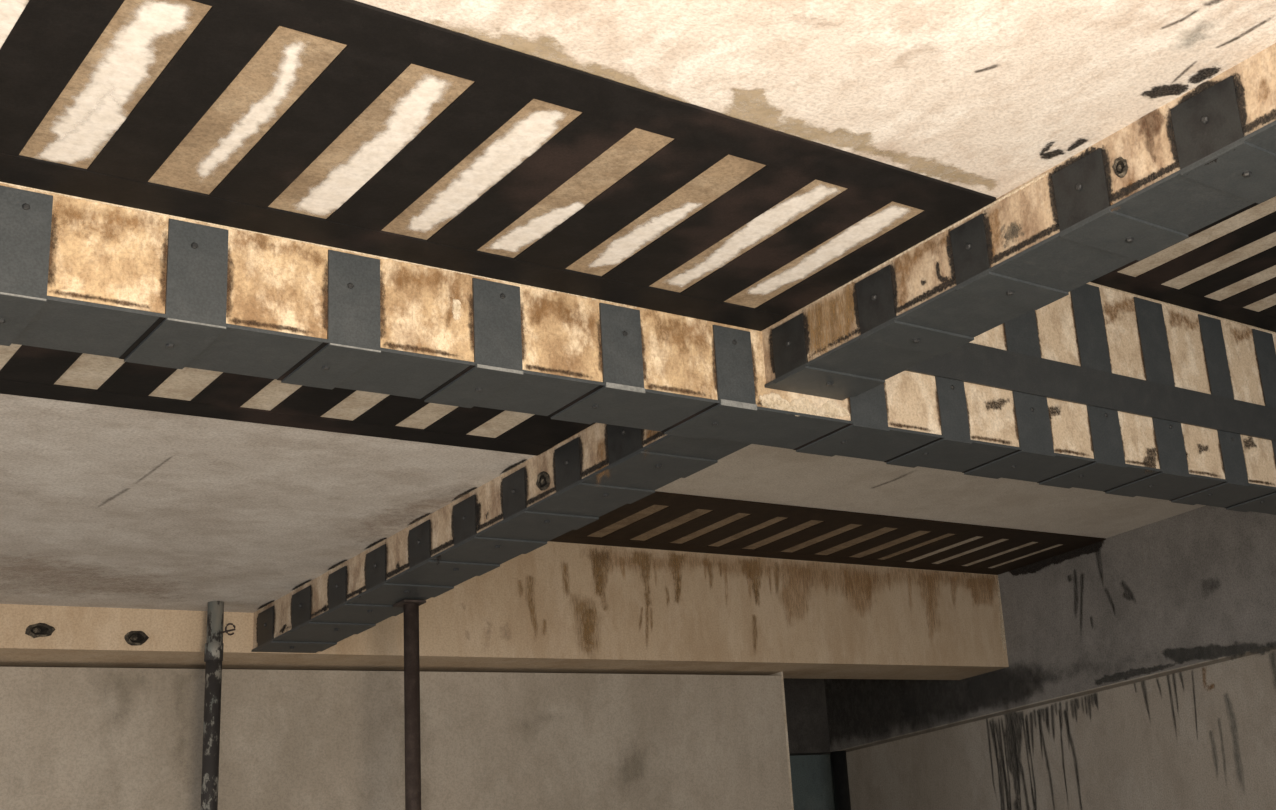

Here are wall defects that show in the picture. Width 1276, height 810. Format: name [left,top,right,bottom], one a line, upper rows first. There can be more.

leakage [433,21,686,103]
leakage [725,89,995,190]
leakage [452,300,461,319]
corrosion [563,551,609,652]
corrosion [633,552,653,638]
leakage [824,642,1276,810]